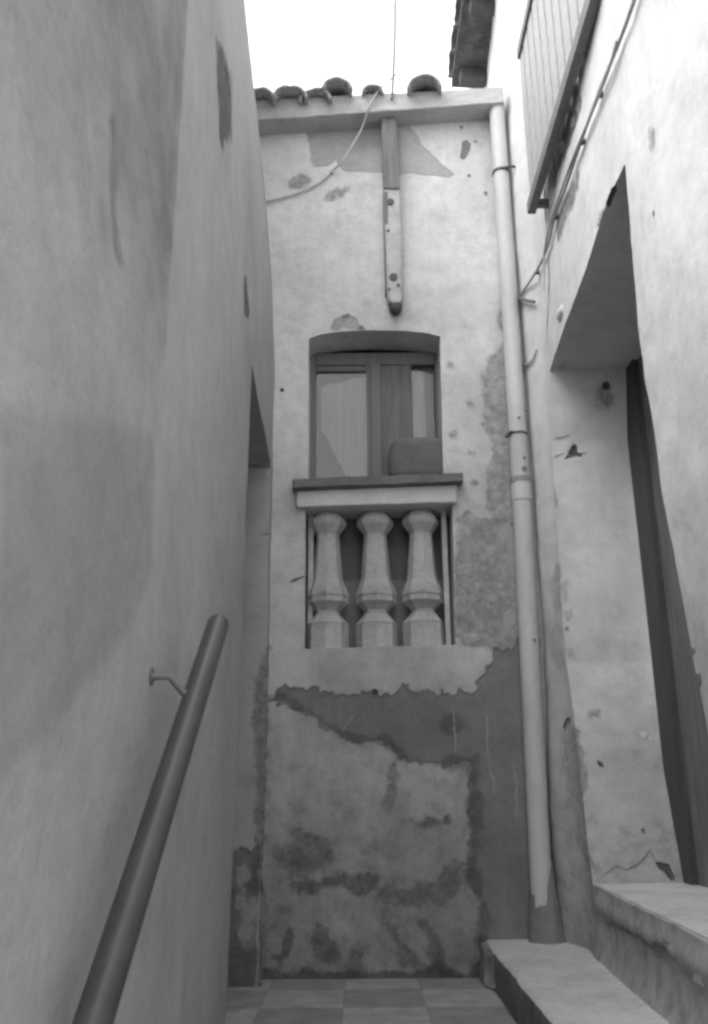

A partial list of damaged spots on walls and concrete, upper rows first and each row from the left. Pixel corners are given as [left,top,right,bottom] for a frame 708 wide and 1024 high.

flaking render [306,128,382,172]
flaking render [397,126,454,177]
spalling [460,125,477,159]
spalling [331,313,365,331]
spalling [554,435,587,460]
flaking render [269,639,530,945]
water stain [261,928,480,979]